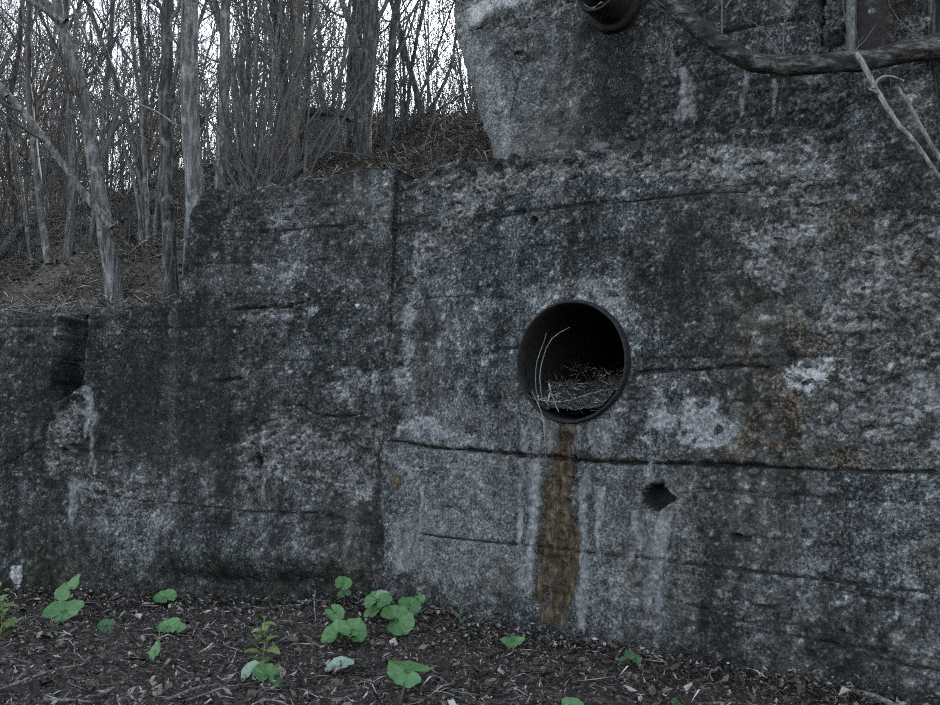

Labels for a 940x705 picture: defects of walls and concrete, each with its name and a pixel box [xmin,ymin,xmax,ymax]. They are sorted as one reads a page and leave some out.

spalling [888,0,932,44]
spalling [232,51,854,502]
spalling [784,213,940,470]
rust [535,425,581,626]